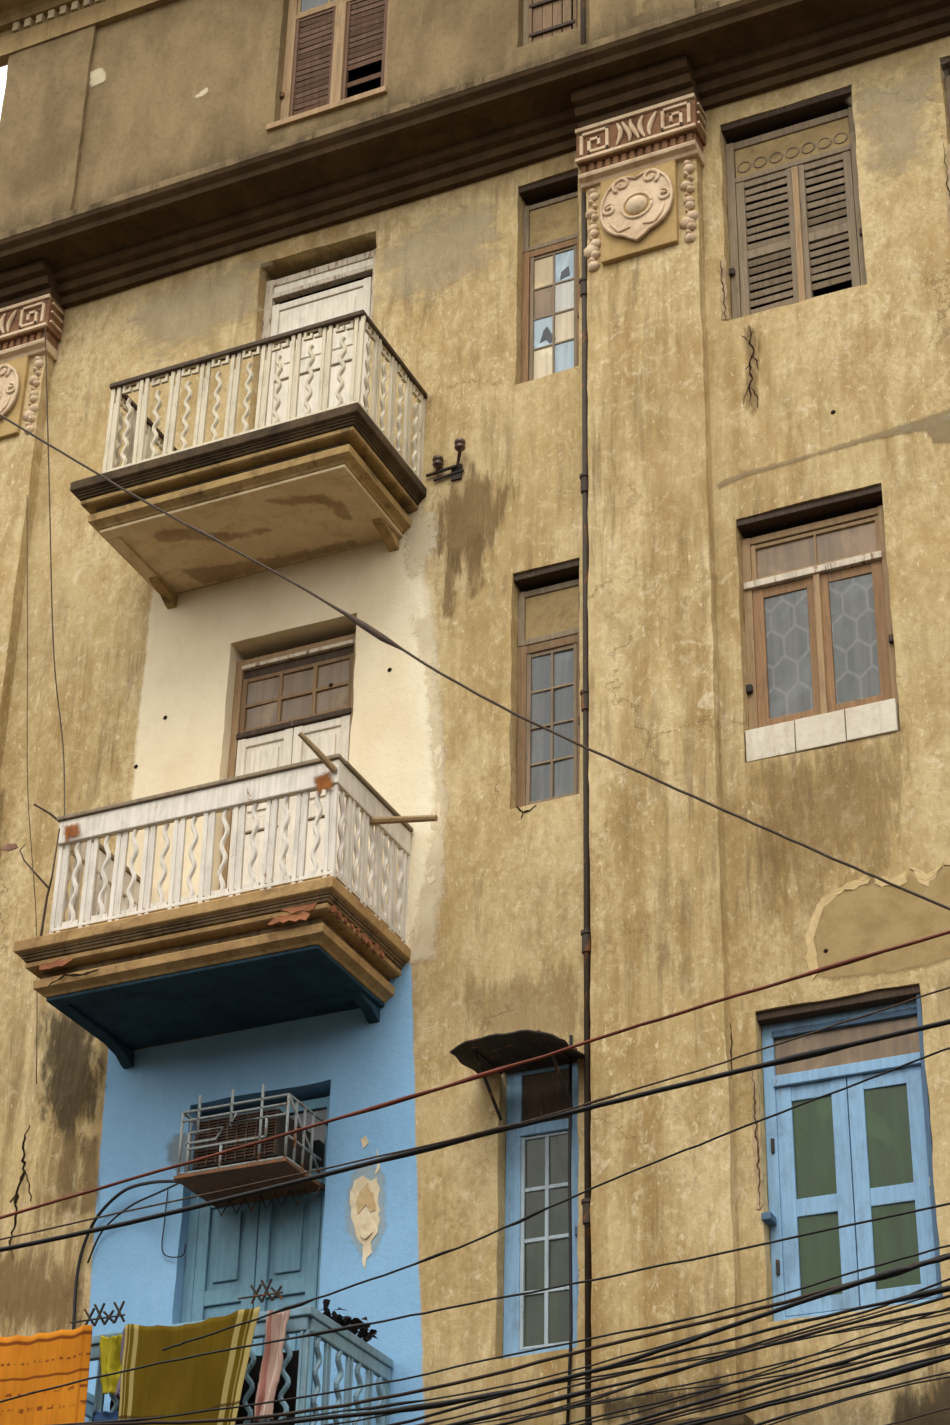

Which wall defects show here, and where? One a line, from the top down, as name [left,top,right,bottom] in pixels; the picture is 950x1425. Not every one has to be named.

crack [741,326,759,408]
water stain [438,463,507,615]
peeling [805,860,950,980]
crack [9,1125,32,1260]
peeling [350,1136,381,1268]